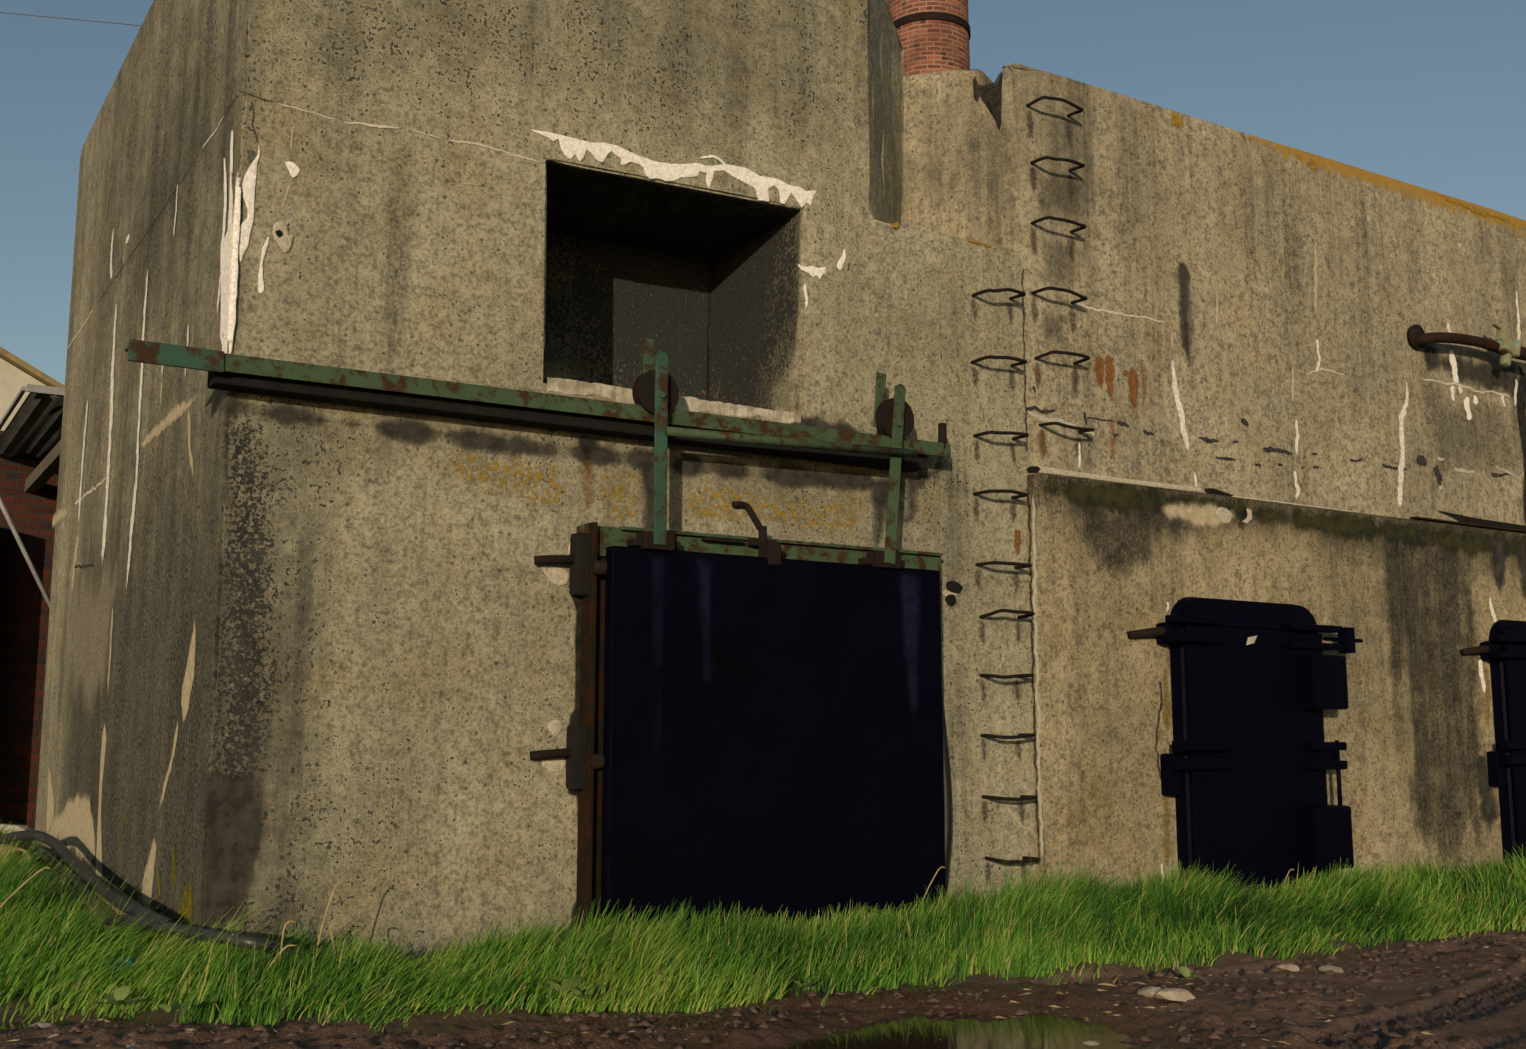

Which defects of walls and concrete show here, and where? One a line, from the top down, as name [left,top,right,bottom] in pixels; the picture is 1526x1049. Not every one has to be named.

corrosion [1095,355,1145,408]
water stain [1171,263,1193,450]
water stain [377,419,654,529]
water stain [673,455,747,478]
water stain [766,465,889,543]
water stain [197,396,325,929]
water stain [1010,339,1526,877]
peeling [46,723,106,877]